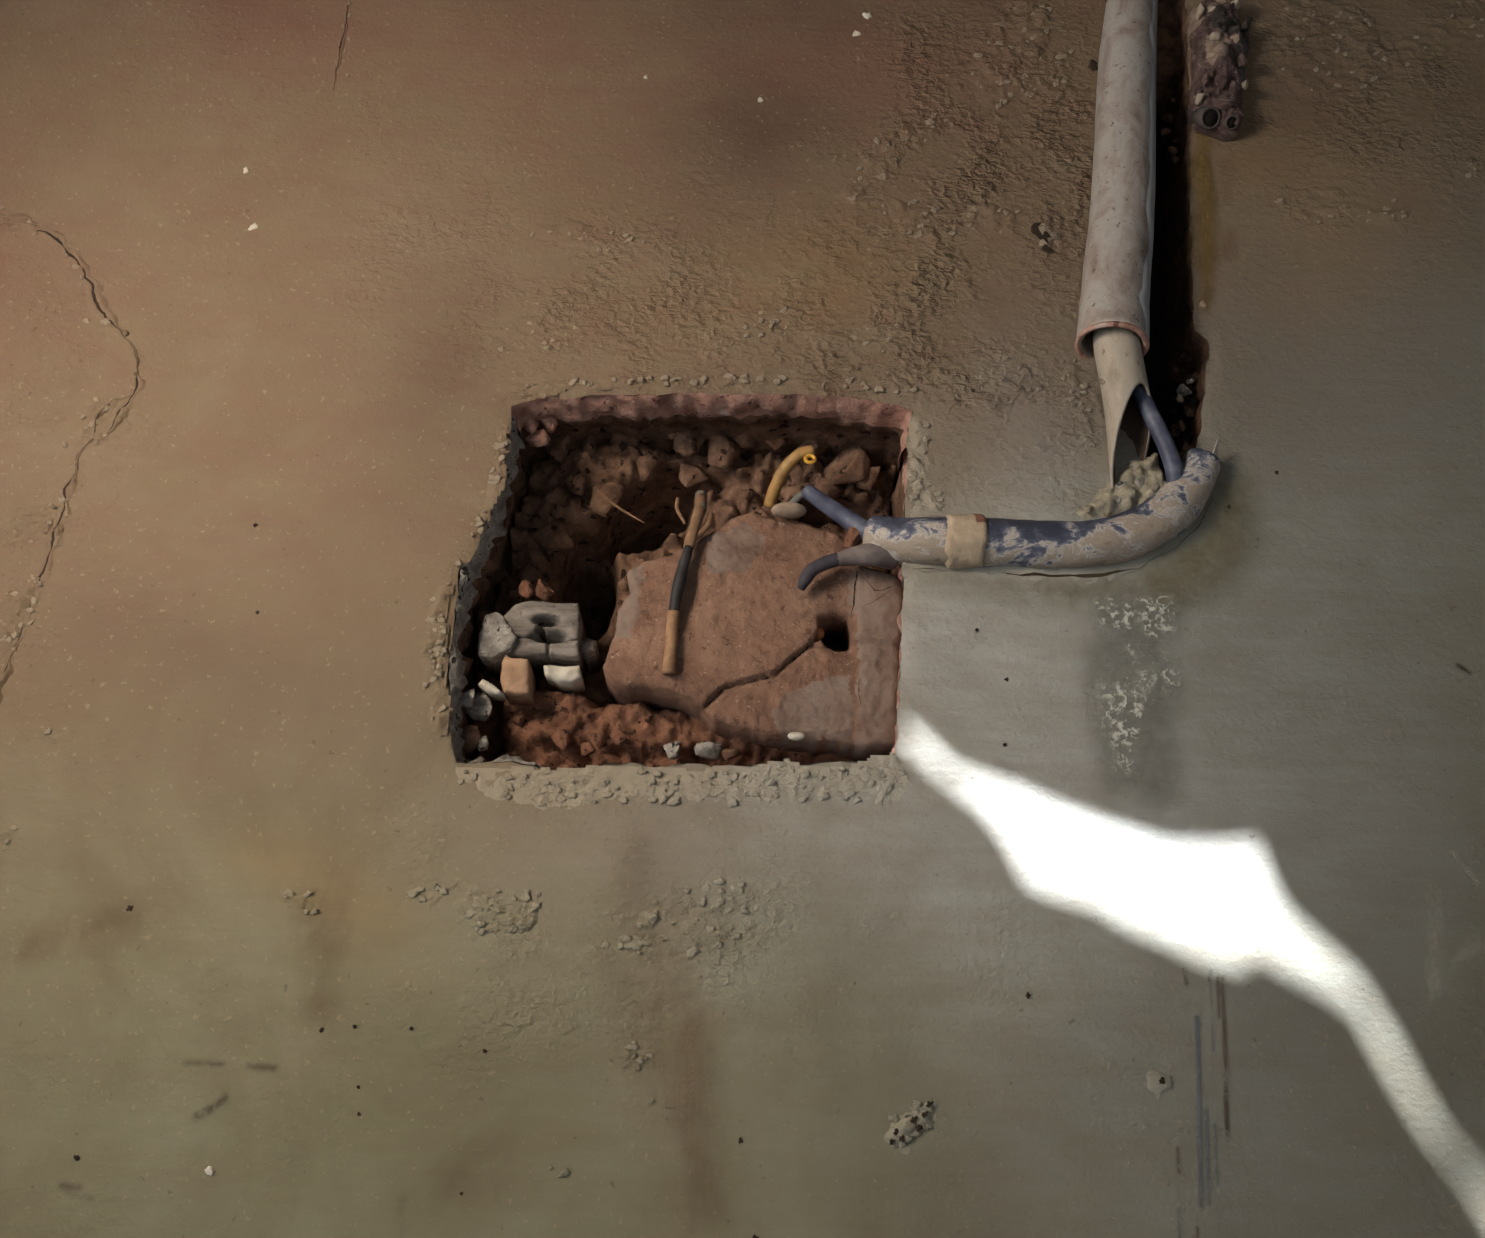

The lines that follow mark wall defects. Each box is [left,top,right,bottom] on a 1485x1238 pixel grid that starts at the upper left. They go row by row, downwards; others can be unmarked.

crack [333,0,352,89]
crack [0,216,146,704]
spalling [419,373,944,811]
leakage [1095,578,1176,772]